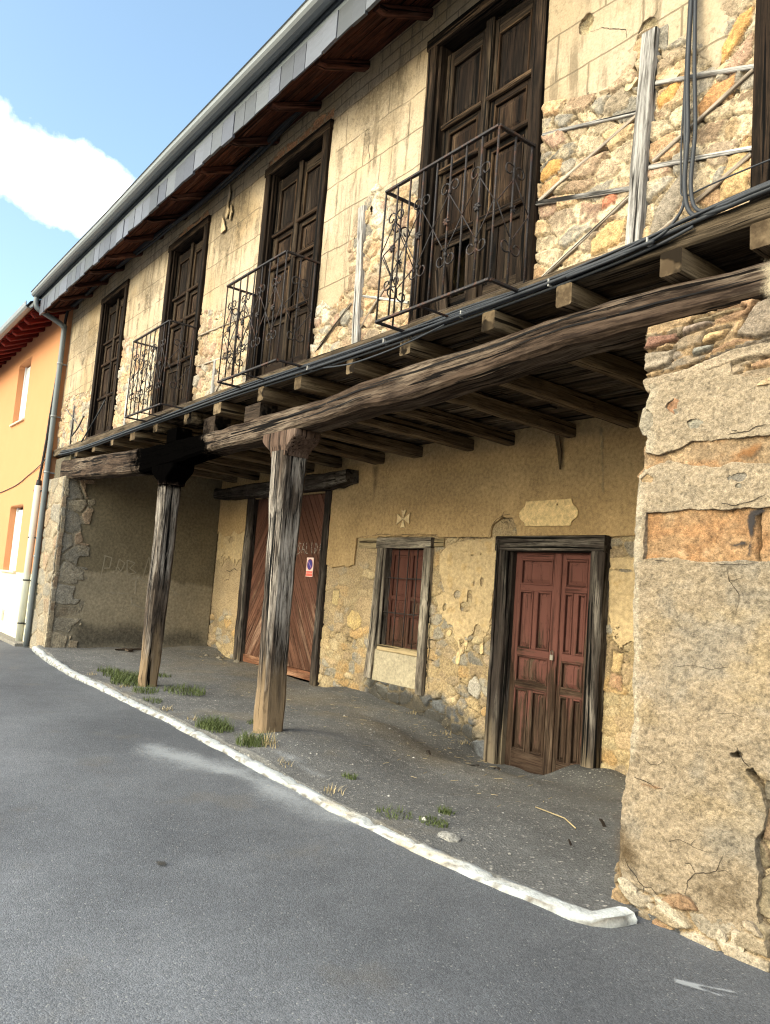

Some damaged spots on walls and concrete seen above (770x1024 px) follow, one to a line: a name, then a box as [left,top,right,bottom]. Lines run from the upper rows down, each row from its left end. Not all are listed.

spalling [533,0,756,279]
spalling [310,176,419,358]
spalling [192,304,252,400]
peeling [436,539,496,666]
crack [669,839,733,893]